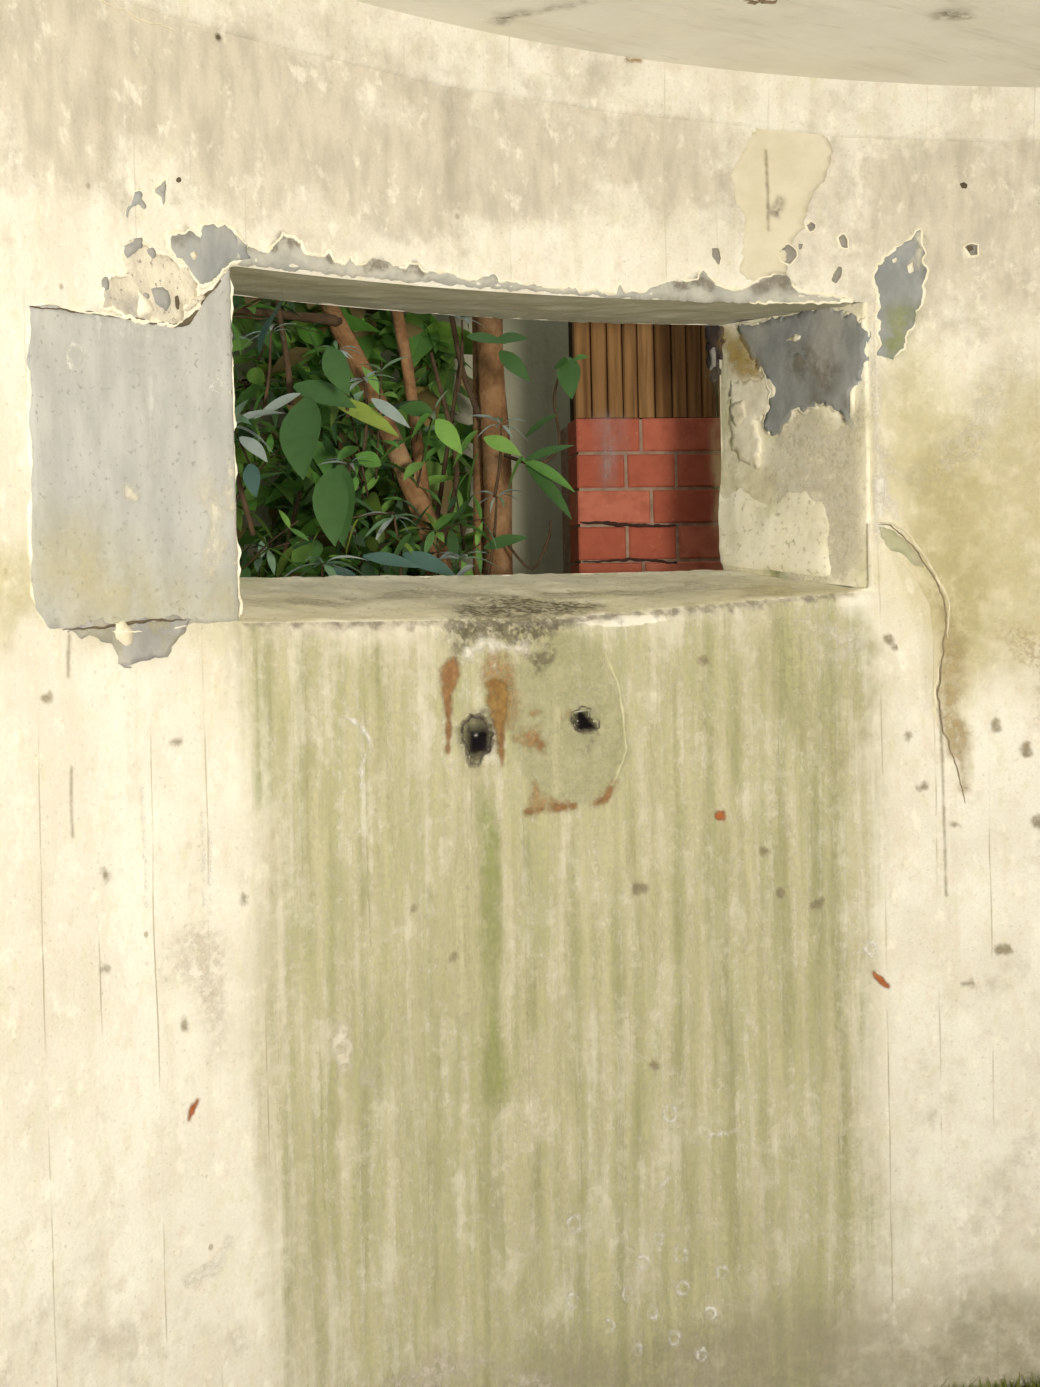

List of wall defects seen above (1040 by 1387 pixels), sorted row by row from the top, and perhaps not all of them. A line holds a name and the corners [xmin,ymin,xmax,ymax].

peeling [26,221,930,670]
rust [441,658,459,754]
rust [485,657,543,761]
crack [877,521,967,811]
rust [526,785,577,813]